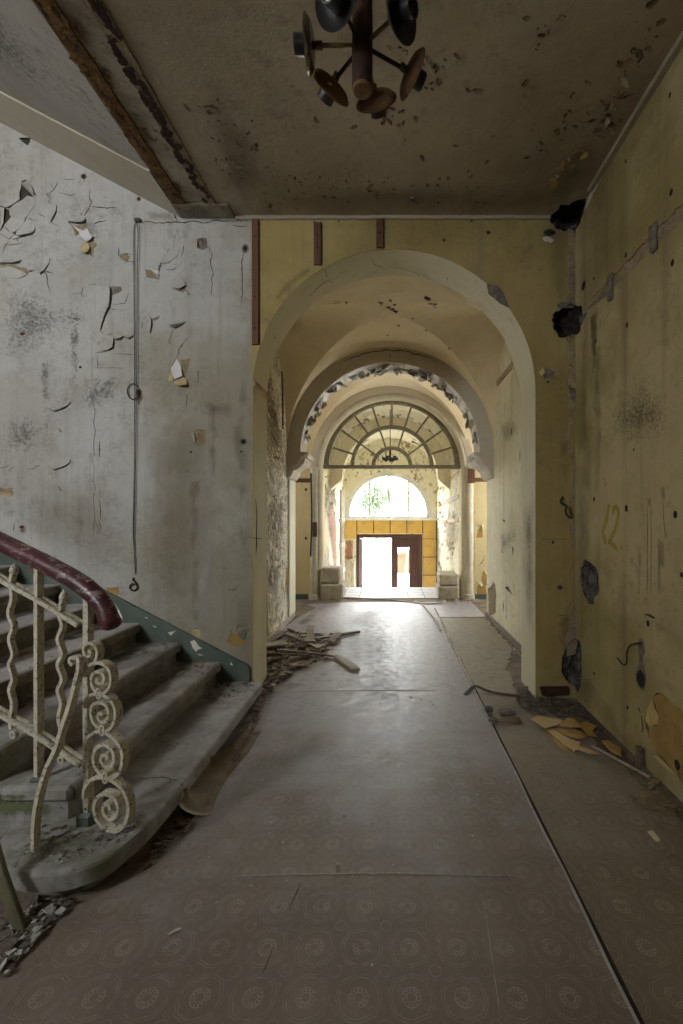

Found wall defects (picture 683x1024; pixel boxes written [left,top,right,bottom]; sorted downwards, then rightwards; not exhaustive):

peeling [0,179,53,288]
peeling [65,193,106,257]
spalling [194,237,208,250]
peeling [87,284,122,331]
peeling [143,268,189,295]
peeling [168,341,190,406]